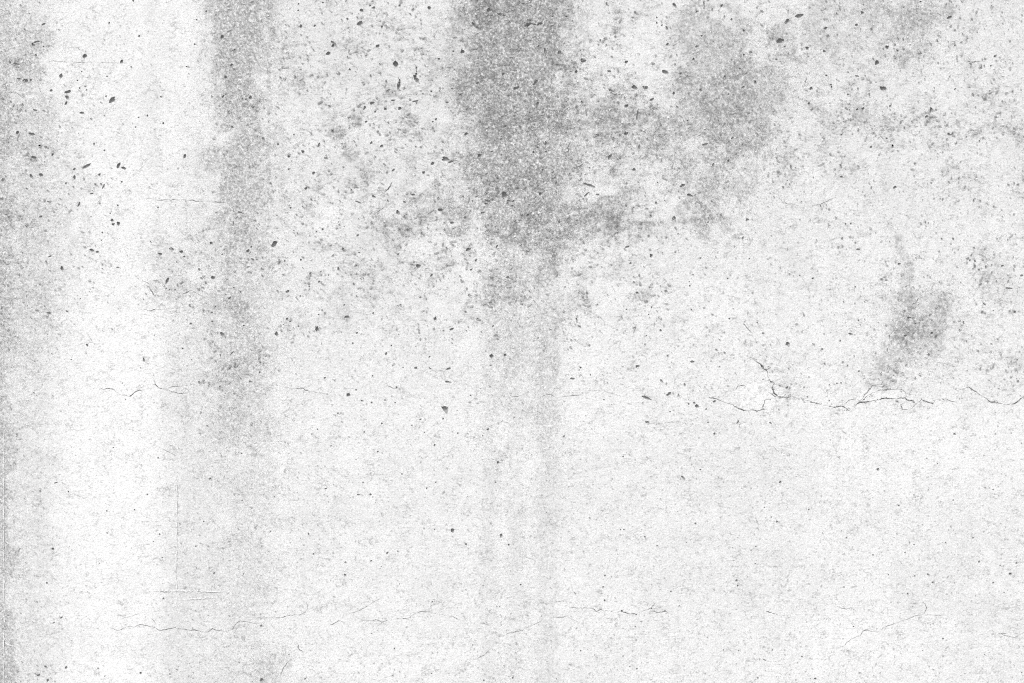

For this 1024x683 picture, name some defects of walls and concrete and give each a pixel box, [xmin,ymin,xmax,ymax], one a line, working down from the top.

leakage [452,0,631,255]
crack [709,358,1024,413]